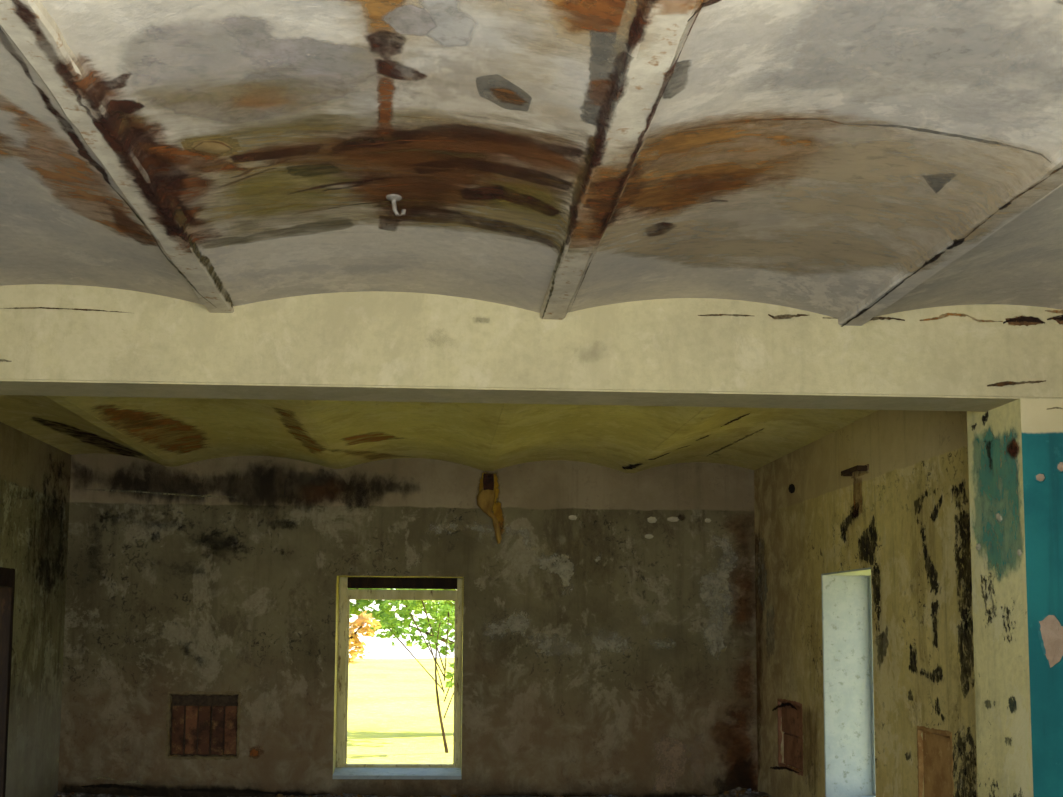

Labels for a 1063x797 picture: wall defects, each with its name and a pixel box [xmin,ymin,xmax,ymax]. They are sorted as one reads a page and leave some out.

corrosion [12,0,50,48]
corrosion [354,0,426,141]
peeling [476,75,532,111]
corrosion [0,50,247,308]
corrosion [542,0,721,318]
crack [0,306,129,314]
flaking render [1004,315,1063,328]
crack [987,379,1046,387]
leakage [109,464,409,508]
mould [840,507,888,670]
mould [914,479,1015,698]
peeling [1037,613,1063,669]